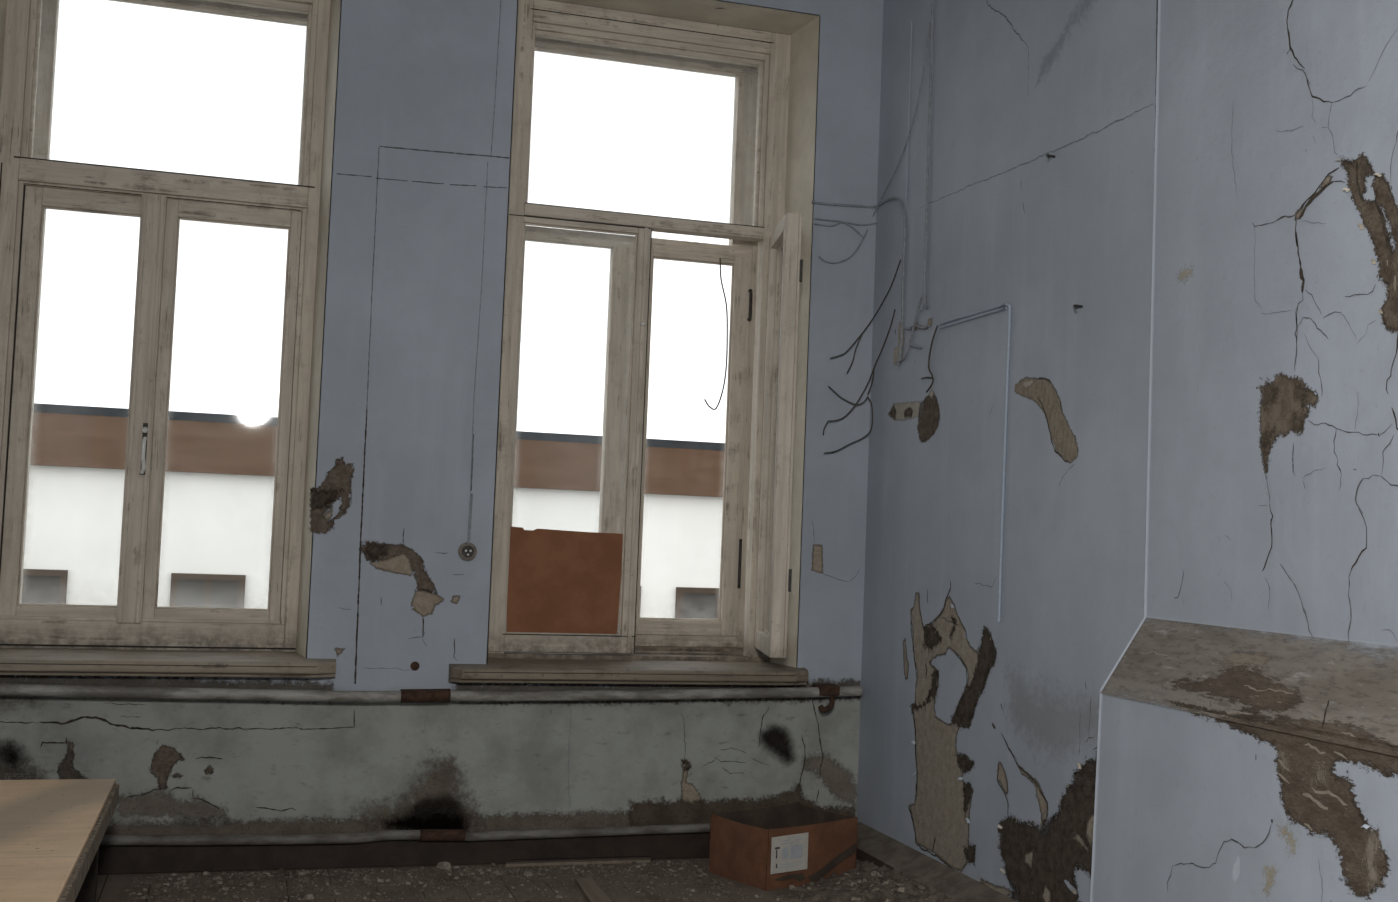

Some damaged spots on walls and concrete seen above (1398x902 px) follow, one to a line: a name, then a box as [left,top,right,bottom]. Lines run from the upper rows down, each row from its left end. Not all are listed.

flaking render [1335,152,1398,333]
crack [1231,0,1398,642]
flaking render [888,391,940,443]
flaking render [1014,376,1079,463]
flaking render [1256,371,1319,479]
flaking render [308,457,355,535]
flaking render [361,531,460,638]
flaking render [117,741,226,822]
flaking render [903,580,1097,902]
flaking render [1167,699,1398,900]